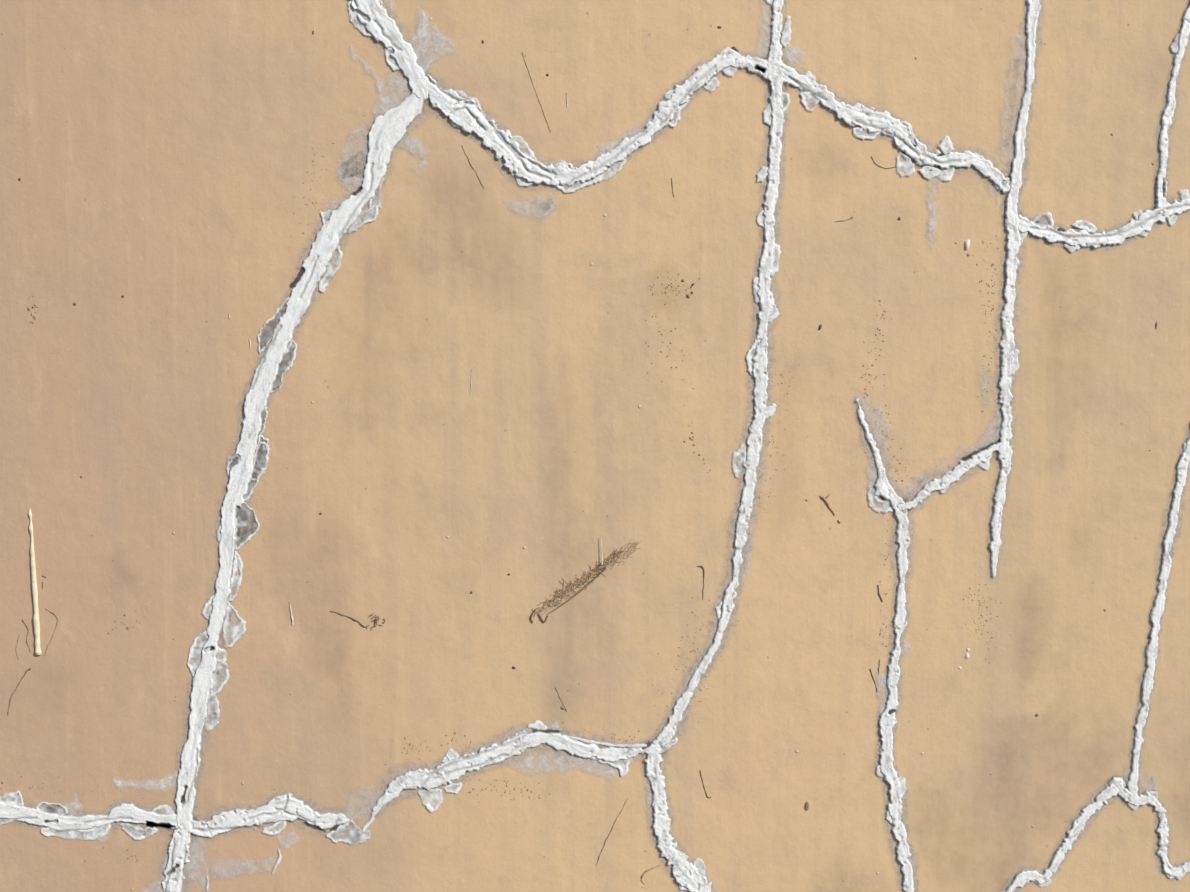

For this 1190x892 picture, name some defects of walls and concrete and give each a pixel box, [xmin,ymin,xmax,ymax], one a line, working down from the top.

crack [0,0,790,892]
crack [414,0,1190,892]